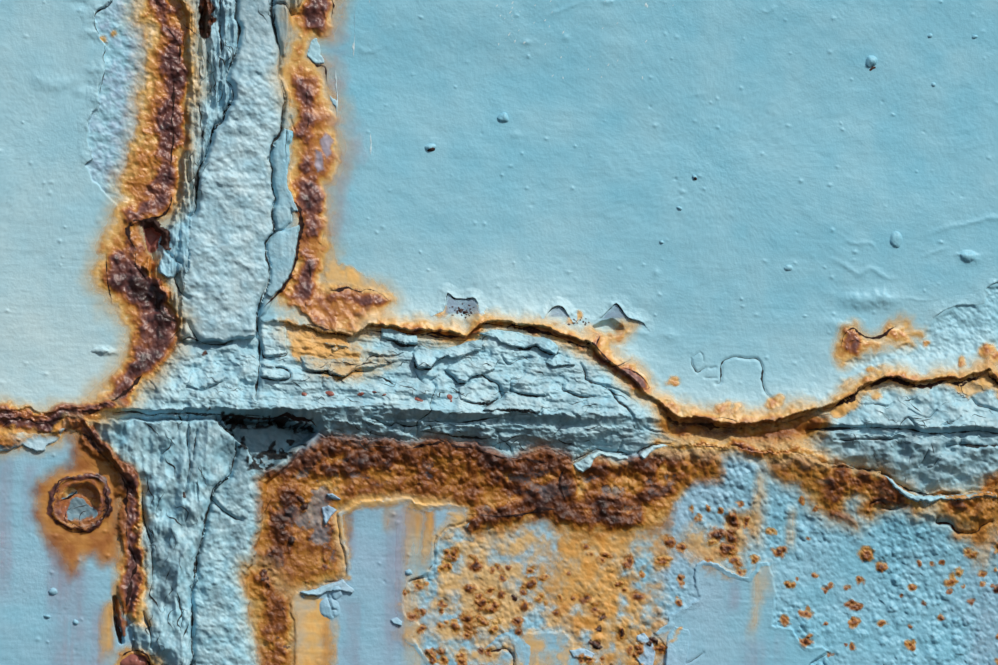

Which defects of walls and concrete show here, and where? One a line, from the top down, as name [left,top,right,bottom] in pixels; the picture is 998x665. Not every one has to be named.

peeling [264,128,300,298]
peeling [923,266,998,327]
corrosion [0,0,198,665]
peeling [187,364,227,390]
peeling [260,319,290,381]
peeling [300,328,575,414]
corrosion [243,0,998,665]
crack [691,354,772,399]
peeling [420,424,495,440]
peeling [573,444,667,473]